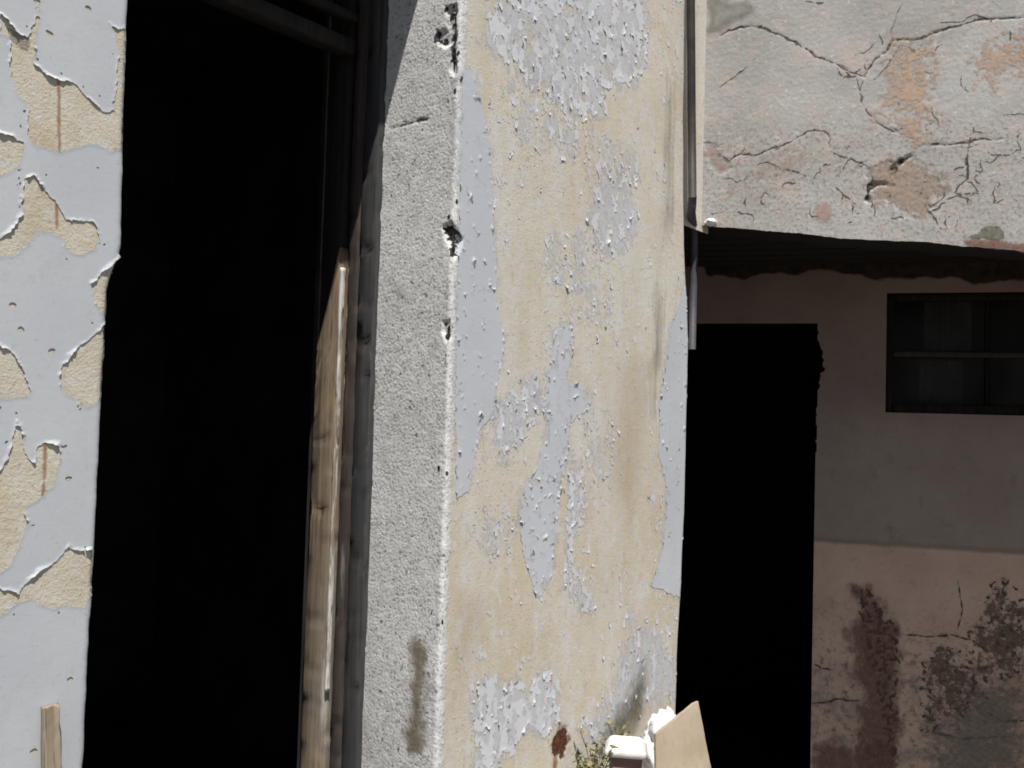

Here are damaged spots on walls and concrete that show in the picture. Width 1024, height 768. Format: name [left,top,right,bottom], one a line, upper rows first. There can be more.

peeling [0,0,126,411]
crack [711,6,1024,229]
spalling [862,30,952,218]
spalling [967,29,1024,92]
peeling [434,0,688,768]
peeling [0,415,94,622]
water stain [406,641,426,751]
corrosion [552,727,571,768]
water stain [813,585,902,768]